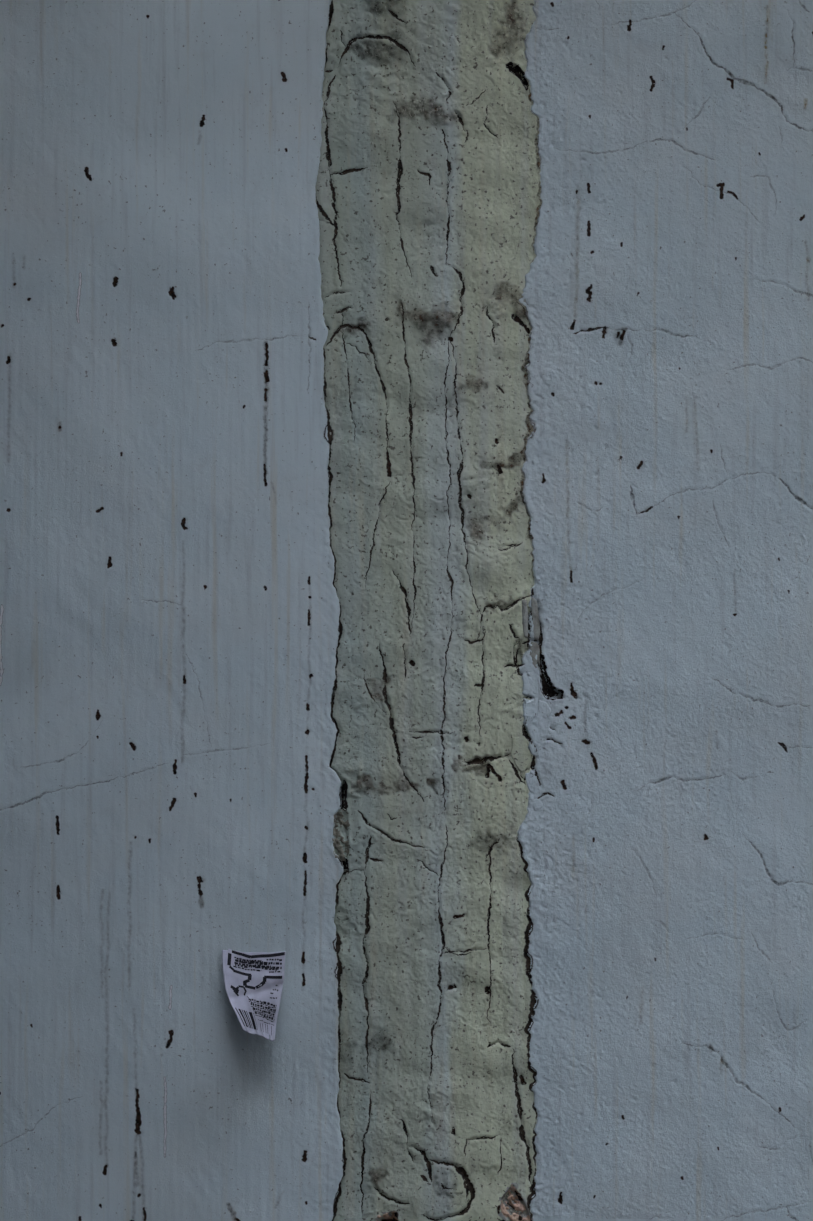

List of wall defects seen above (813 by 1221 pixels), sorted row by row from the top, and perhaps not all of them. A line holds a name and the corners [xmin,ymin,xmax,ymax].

spalling [506,62,529,91]
crack [687,25,804,130]
spalling [511,314,530,334]
crack [573,326,608,334]
crack [309,0,562,1221]
spalling [485,764,502,782]
spalling [332,780,350,875]
spalling [374,1210,399,1221]
spalling [497,1183,533,1221]